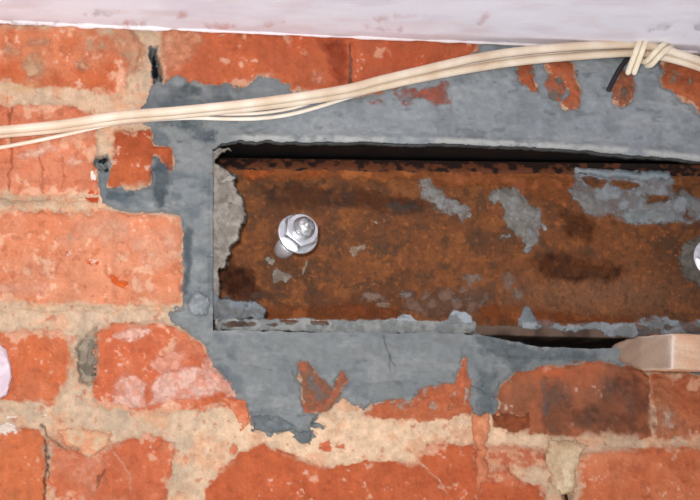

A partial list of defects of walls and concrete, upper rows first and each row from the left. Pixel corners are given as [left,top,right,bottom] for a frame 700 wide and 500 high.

spalling [517,61,580,110]
spalling [612,70,635,106]
spalling [661,63,700,107]
rust [229,169,574,211]
rust [218,264,272,301]
rust [265,303,399,322]
rust [534,310,635,325]
spalling [298,362,348,412]
spalling [364,357,473,423]